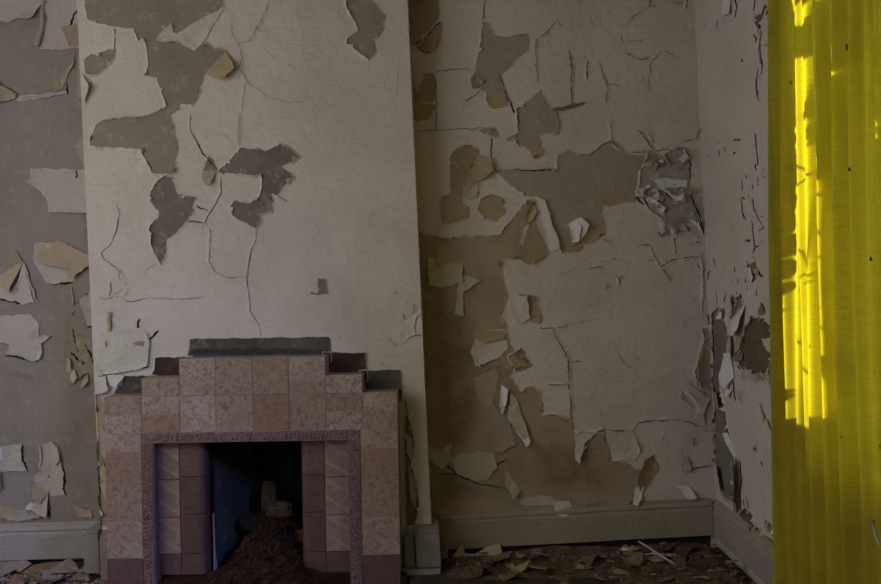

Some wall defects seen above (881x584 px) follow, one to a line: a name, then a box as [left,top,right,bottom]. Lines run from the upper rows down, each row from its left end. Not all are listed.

peeling [0,0,234,266]
peeling [192,134,302,231]
crack [232,3,309,145]
peeling [409,0,441,53]
crack [535,20,561,82]
crack [568,49,766,253]
crack [741,0,768,102]
peeling [0,242,94,389]
spalling [74,336,420,527]
peeling [412,7,705,519]
crack [539,318,714,453]
peeling [708,291,773,545]